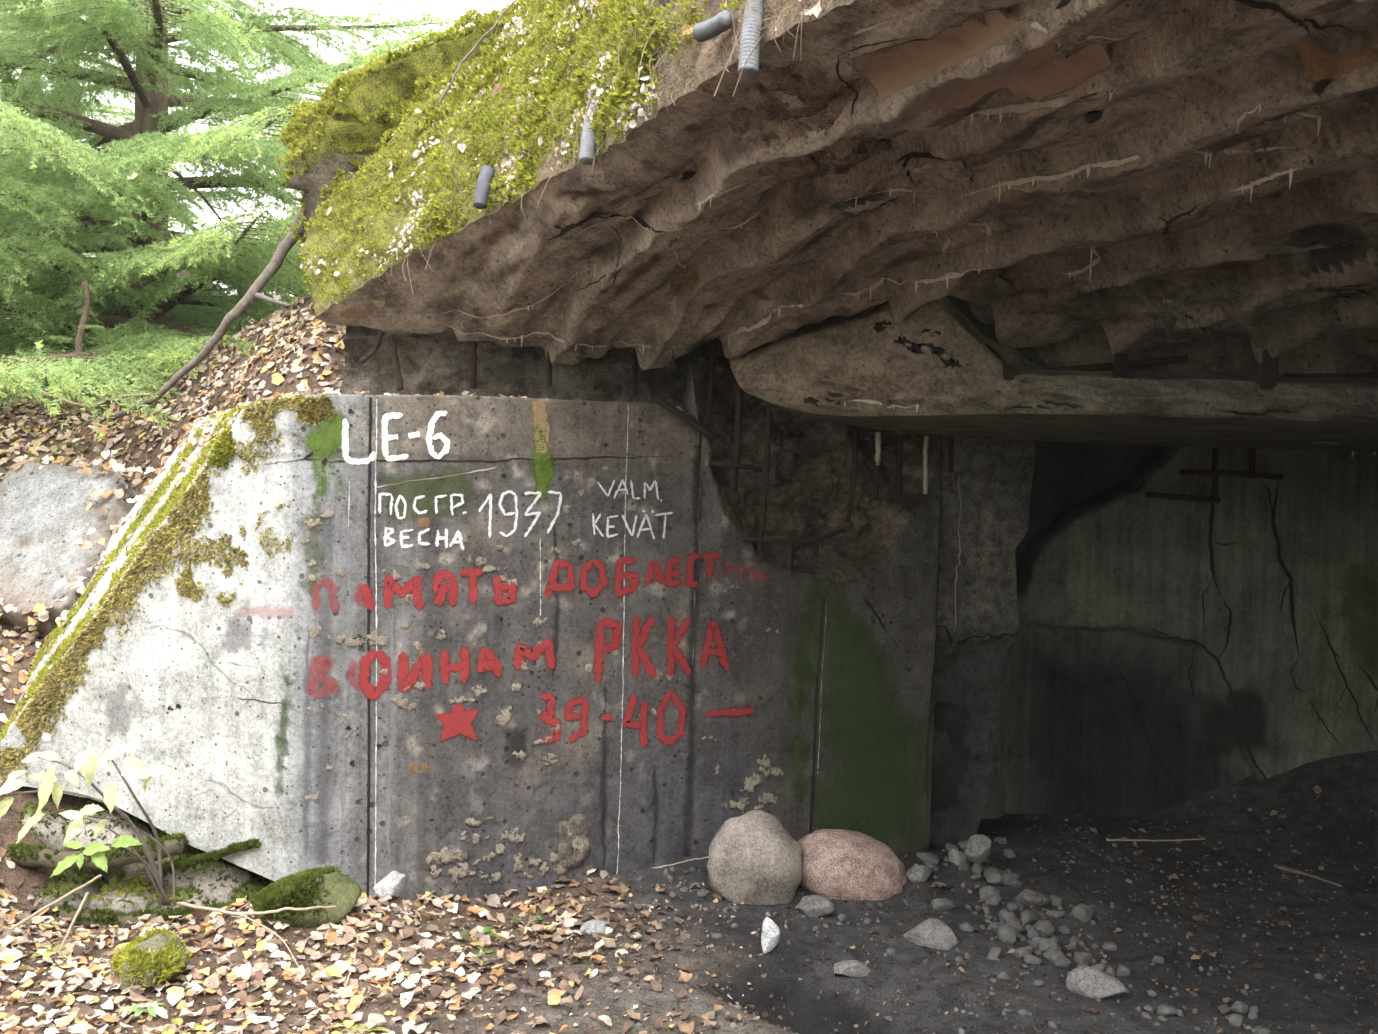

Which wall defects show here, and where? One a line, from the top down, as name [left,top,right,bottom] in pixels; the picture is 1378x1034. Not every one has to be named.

crack [1235,0,1359,36]
peeling [727,9,1112,181]
water stain [1193,104,1325,167]
water stain [961,155,1178,201]
water stain [1229,167,1303,203]
crack [548,211,665,292]
water stain [835,223,992,299]
water stain [707,304,815,345]
crack [1142,495,1237,707]
crack [1260,479,1378,749]